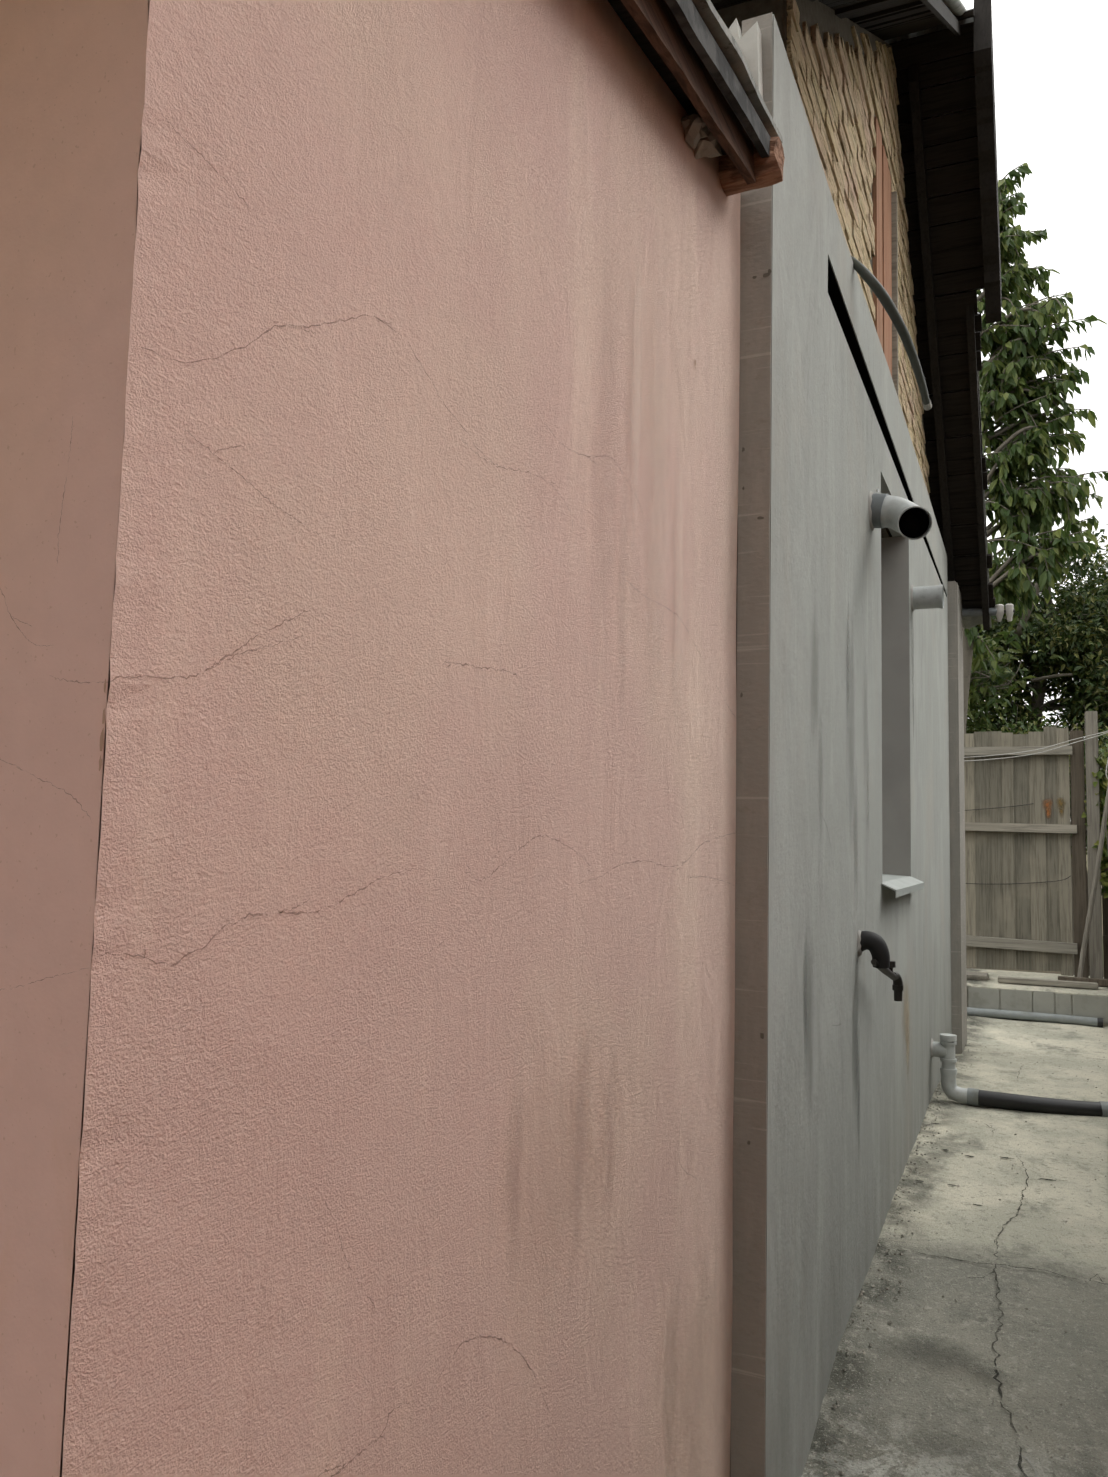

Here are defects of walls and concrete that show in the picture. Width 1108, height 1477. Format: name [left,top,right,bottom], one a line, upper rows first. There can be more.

crack [884,1160,1104,1477]